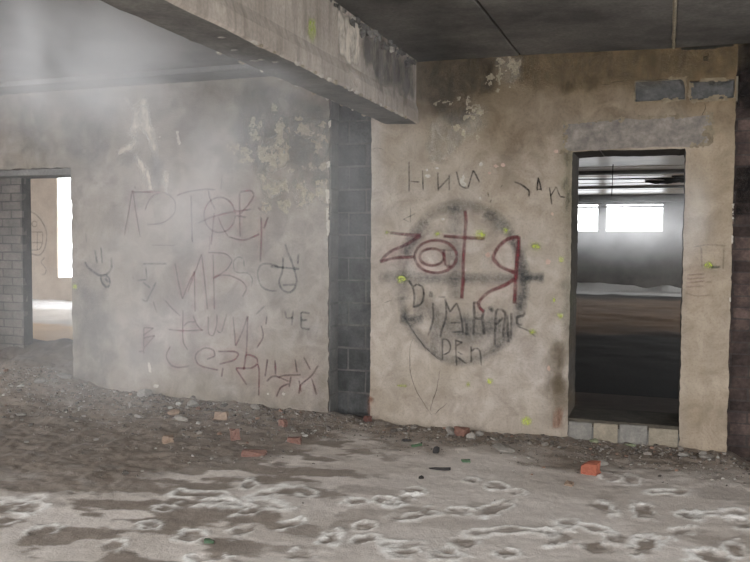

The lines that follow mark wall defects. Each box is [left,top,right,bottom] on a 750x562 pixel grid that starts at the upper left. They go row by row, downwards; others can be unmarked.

spalling [330,0,416,67]
peeling [485,56,521,92]
peeling [433,96,484,137]